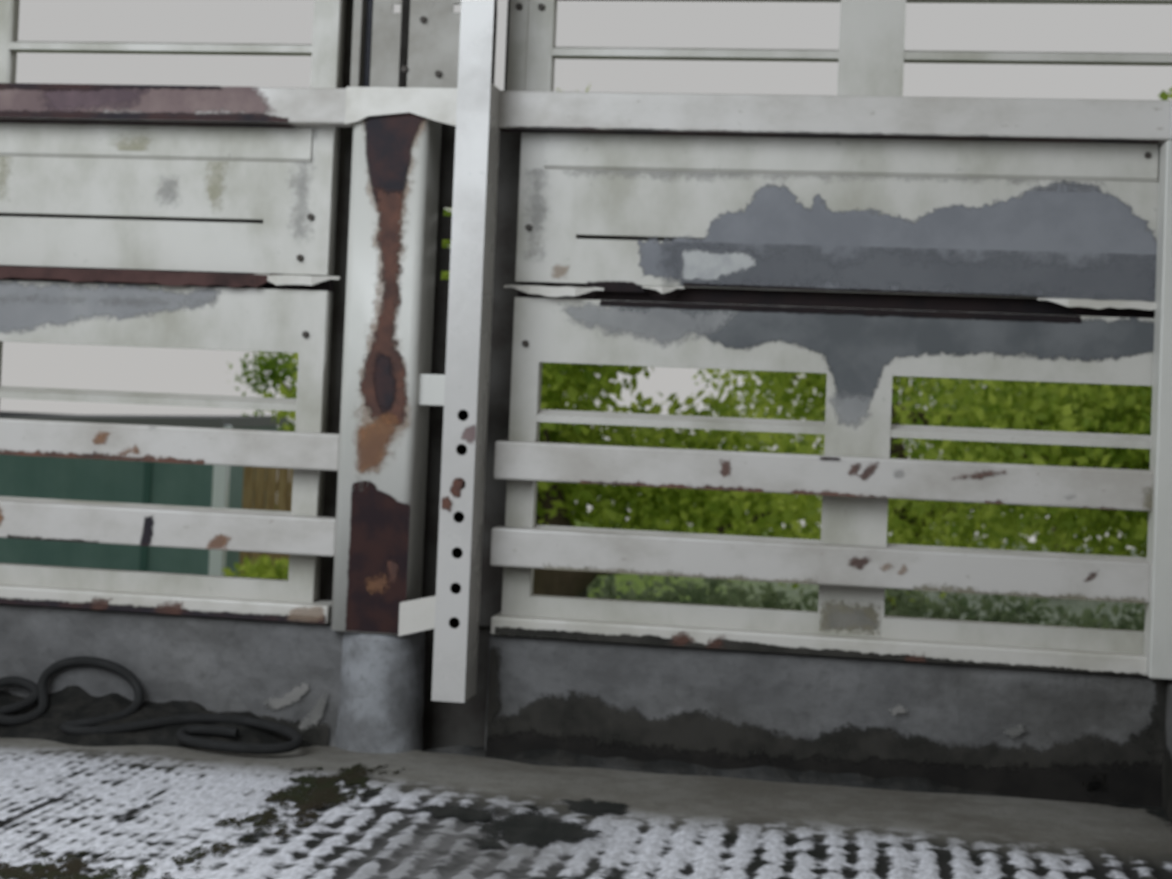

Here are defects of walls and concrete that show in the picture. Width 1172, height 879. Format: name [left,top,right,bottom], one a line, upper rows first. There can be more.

corrosion [0,83,293,128]
peeling [587,180,1157,323]
corrosion [345,113,425,634]
corrosion [0,432,204,465]
corrosion [461,425,476,443]
corrosion [580,460,763,492]
corrosion [848,463,876,480]
corrosion [960,470,1005,479]
corrosion [441,478,463,512]
corrosion [140,516,153,546]
corrosion [207,534,230,549]
leakage [486,646,1172,825]